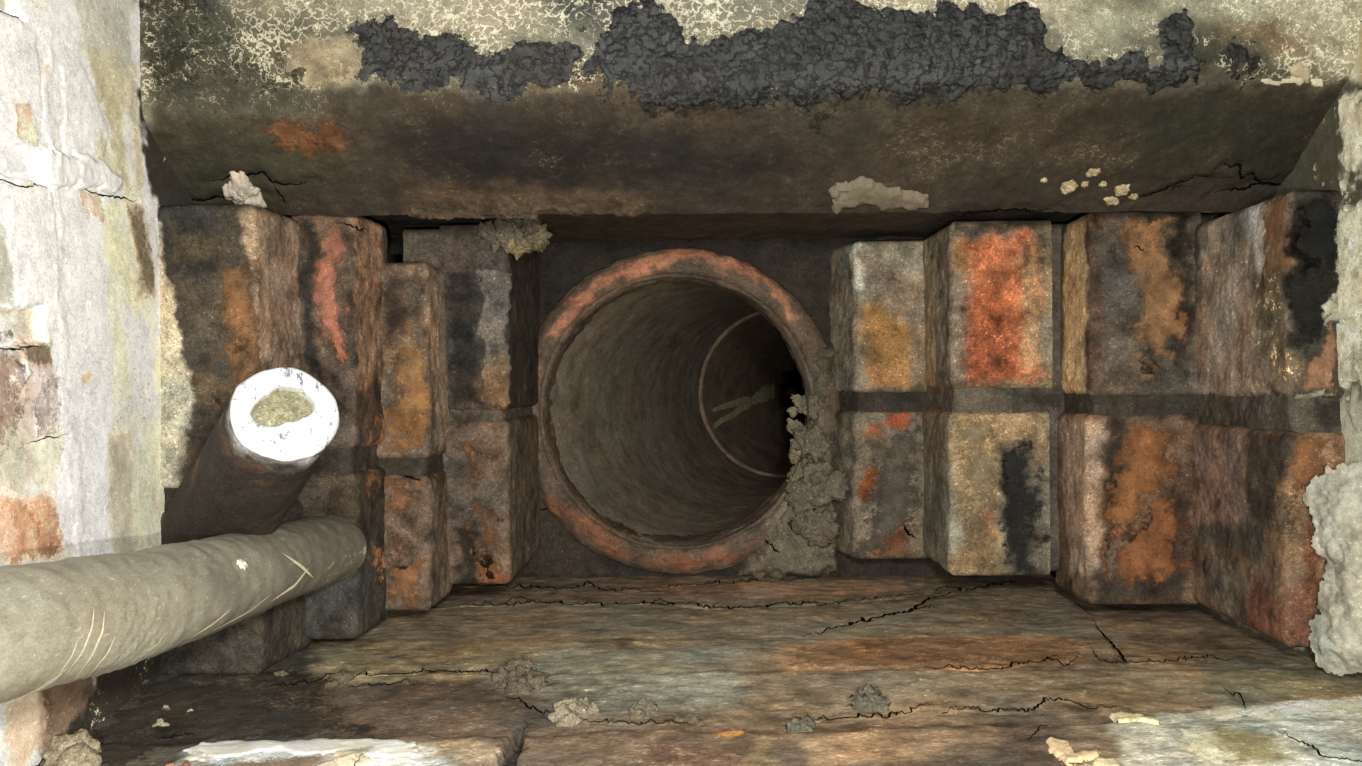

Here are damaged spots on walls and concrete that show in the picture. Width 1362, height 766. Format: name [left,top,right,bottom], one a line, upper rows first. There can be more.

corrosion [239,111,356,167]
crack [1125,163,1282,202]
damp [1342,98,1362,166]
corrosion [1117,214,1189,385]
damp [1295,198,1362,399]
corrosion [1100,422,1192,587]
crack [434,539,1019,637]
crack [814,600,1246,739]
crack [1278,731,1362,762]